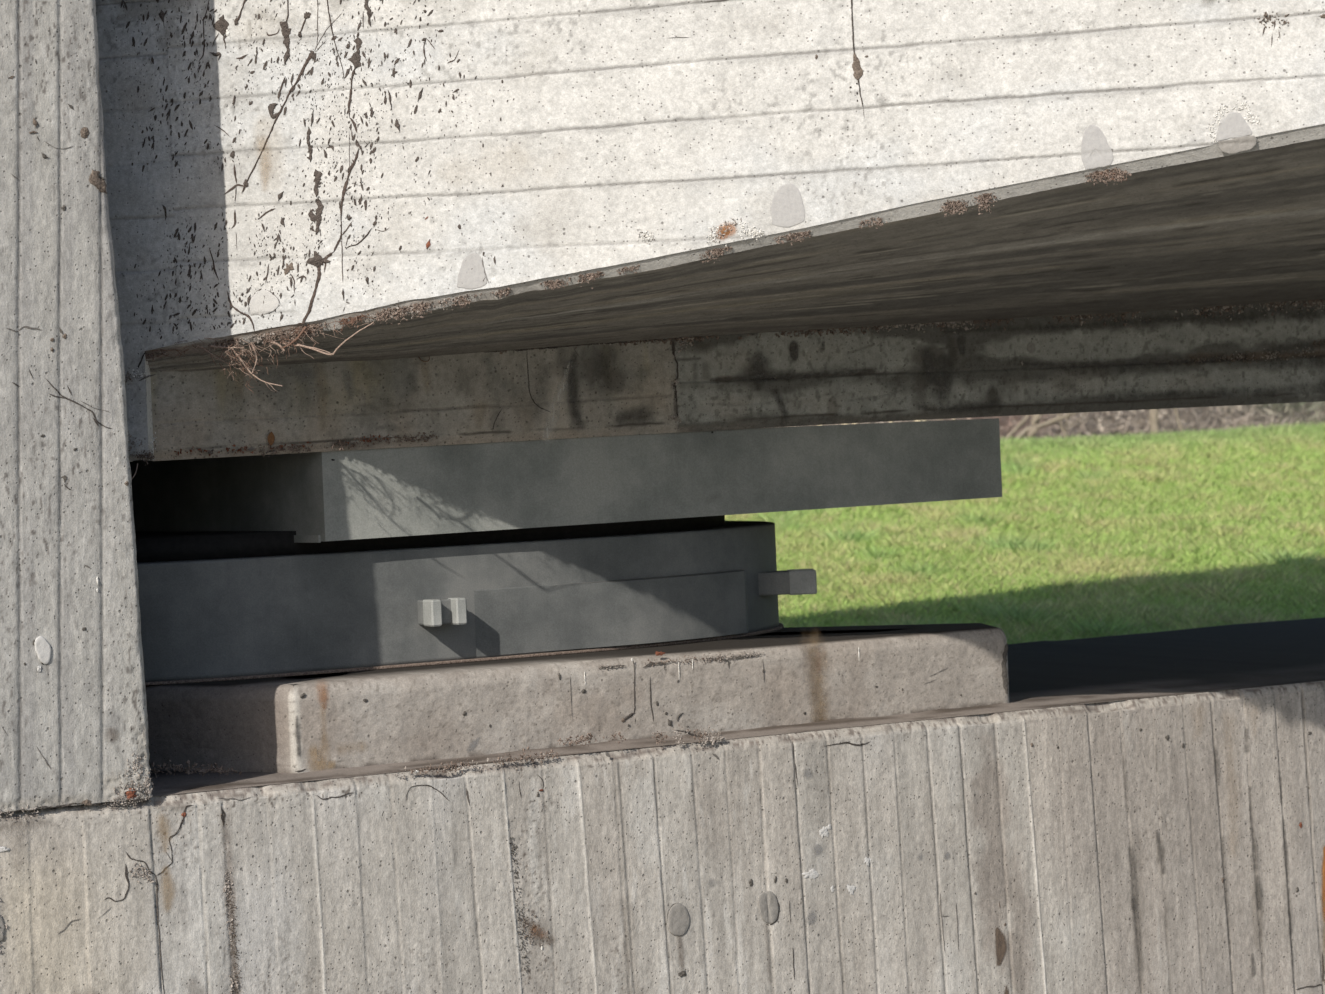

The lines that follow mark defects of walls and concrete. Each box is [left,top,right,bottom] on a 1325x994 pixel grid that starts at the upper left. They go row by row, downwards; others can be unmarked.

crack [851,0,864,114]